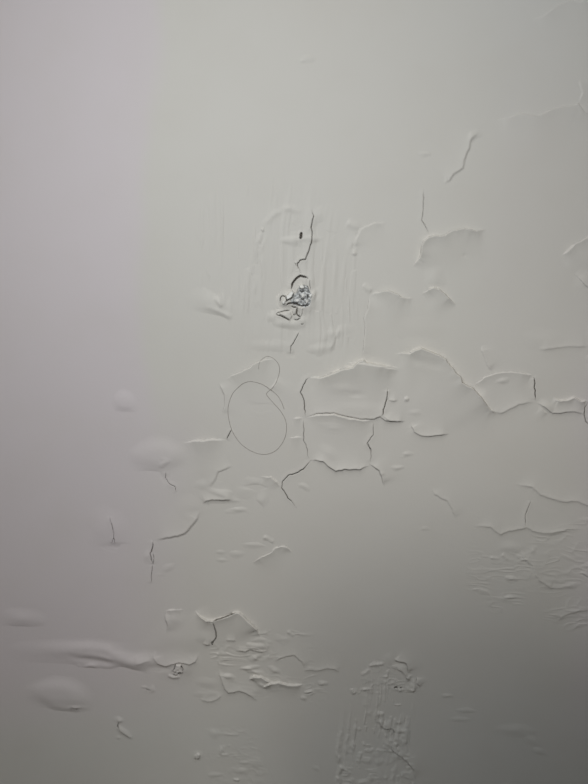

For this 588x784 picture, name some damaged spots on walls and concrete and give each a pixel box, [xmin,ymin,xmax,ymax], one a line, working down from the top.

crack [288,200,320,275]
peeling [143,603,343,709]